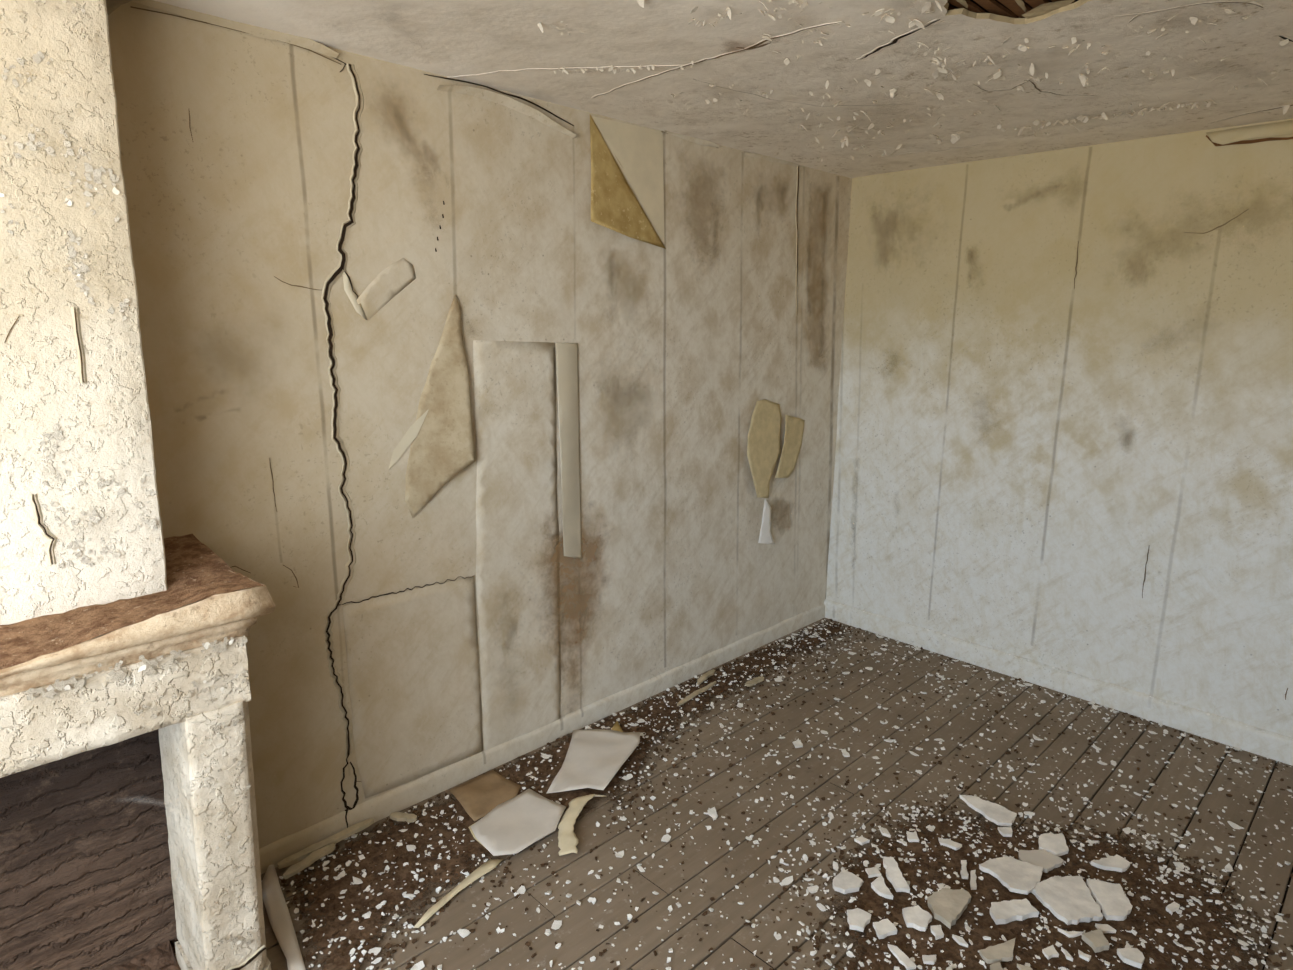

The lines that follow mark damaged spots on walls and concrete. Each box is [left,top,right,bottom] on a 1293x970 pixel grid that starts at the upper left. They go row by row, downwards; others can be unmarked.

crack [424,22,900,126]
crack [856,19,944,61]
crack [130,6,475,828]